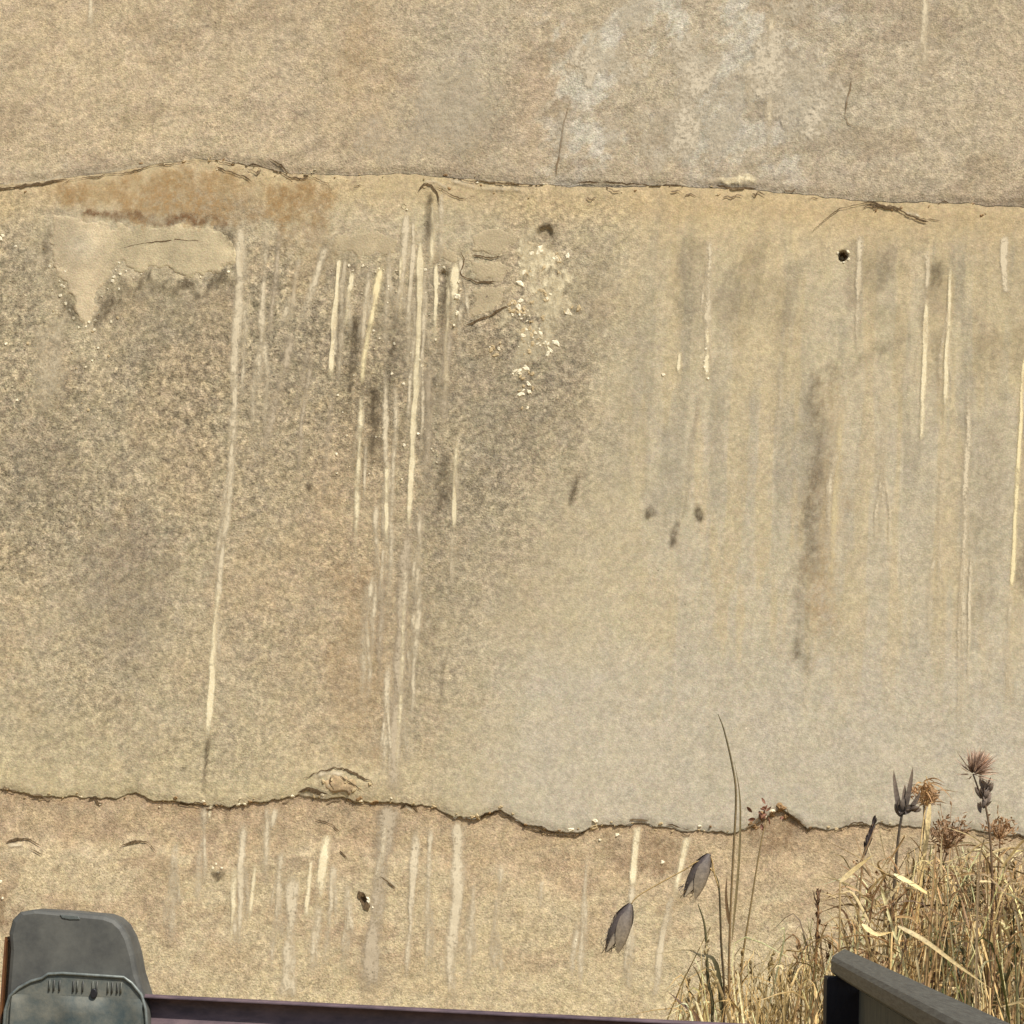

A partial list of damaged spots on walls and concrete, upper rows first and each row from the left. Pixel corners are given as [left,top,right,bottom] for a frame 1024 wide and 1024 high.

crack [0,161,190,190]
crack [418,109,756,206]
flaking render [37,215,236,390]
flaking render [422,229,582,410]
leakage [920,271,951,437]
leakage [204,195,469,788]
spalling [158,796,255,812]
leakage [230,809,354,995]
crack [298,766,373,861]
leakage [405,823,477,992]
crack [477,811,586,837]
spalling [745,803,814,832]